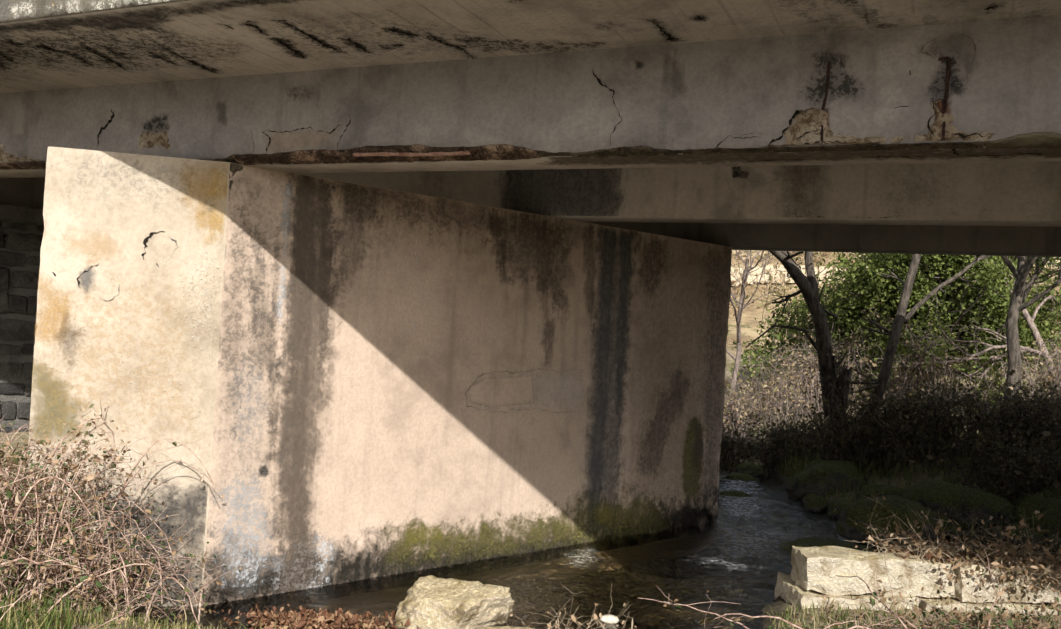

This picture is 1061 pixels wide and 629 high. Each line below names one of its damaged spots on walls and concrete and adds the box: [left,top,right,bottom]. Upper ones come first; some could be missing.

damp [0,0,294,36]
damp [483,39,605,52]
spalling [0,143,46,170]
crack [97,110,114,146]
spalling [137,116,171,150]
crack [251,116,351,153]
spalling [198,144,540,191]
crack [588,69,622,147]
spalling [569,56,1061,157]
corrosion [806,51,862,135]
damp [492,146,1061,304]
damp [97,174,719,616]